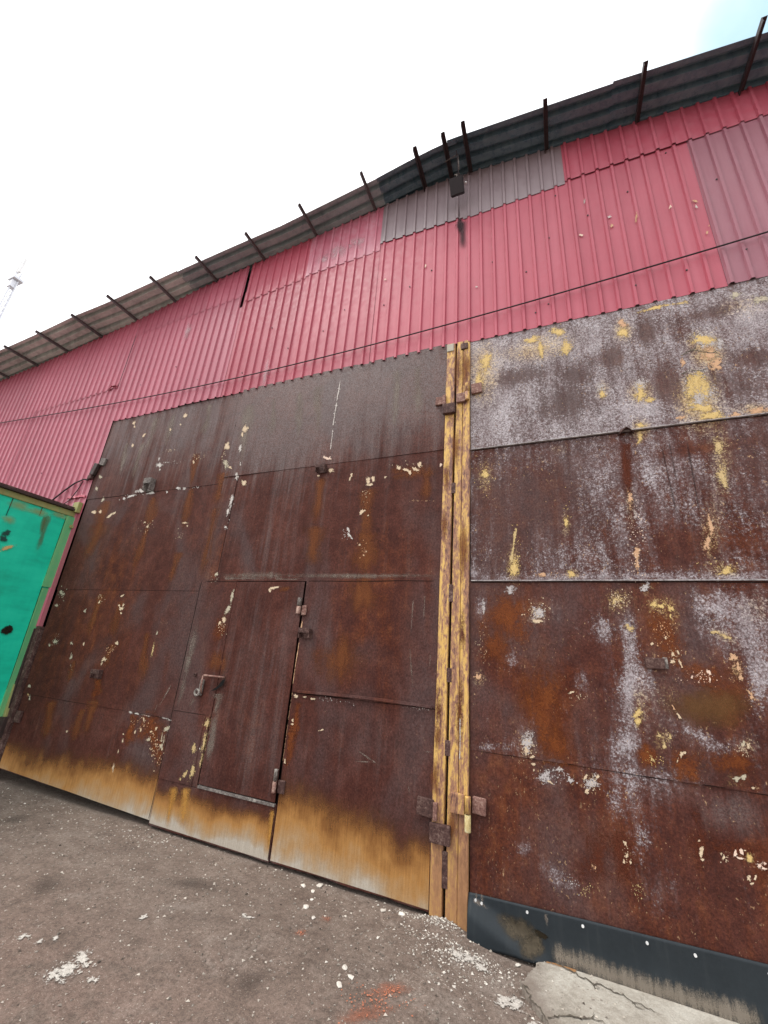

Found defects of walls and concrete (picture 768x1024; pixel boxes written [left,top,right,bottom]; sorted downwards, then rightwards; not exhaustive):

peeling [524,328,572,361]
peeling [673,329,768,420]
peeling [222,426,249,485]
peeling [360,462,423,516]
corrosion [619,443,633,492]
corrosion [354,489,376,609]
peeling [118,711,170,772]
peeling [521,731,601,795]
corrosion [0,744,430,910]
corrosion [581,830,635,881]
corrosion [689,809,768,881]
crack [523,962,657,1021]